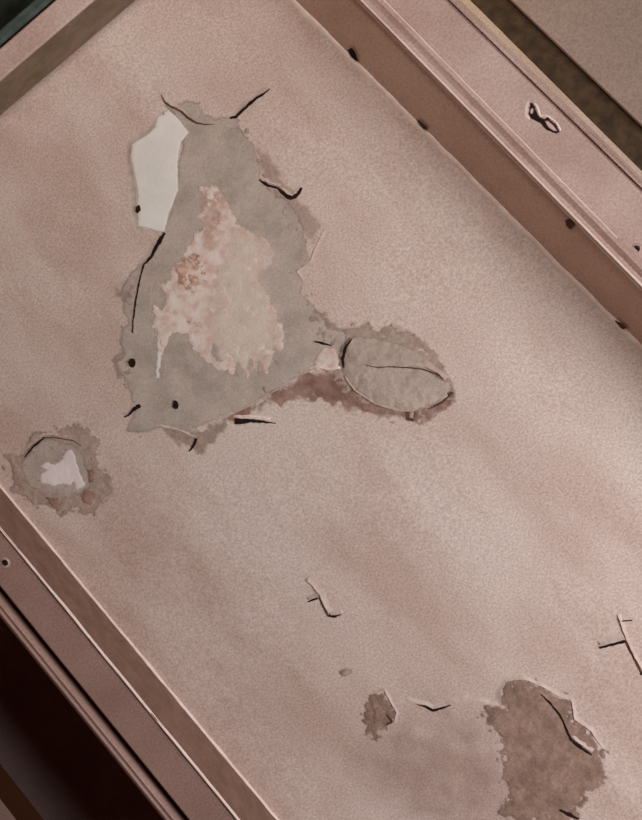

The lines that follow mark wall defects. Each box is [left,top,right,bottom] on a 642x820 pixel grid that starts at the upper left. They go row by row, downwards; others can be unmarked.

crack [229,85,270,119]
crack [259,175,303,200]
peeling [113,92,345,453]
peeling [2,423,112,517]
crack [308,598,341,618]
crack [599,620,642,675]
peeling [362,688,399,741]
crack [407,695,490,712]
peeling [477,674,611,820]